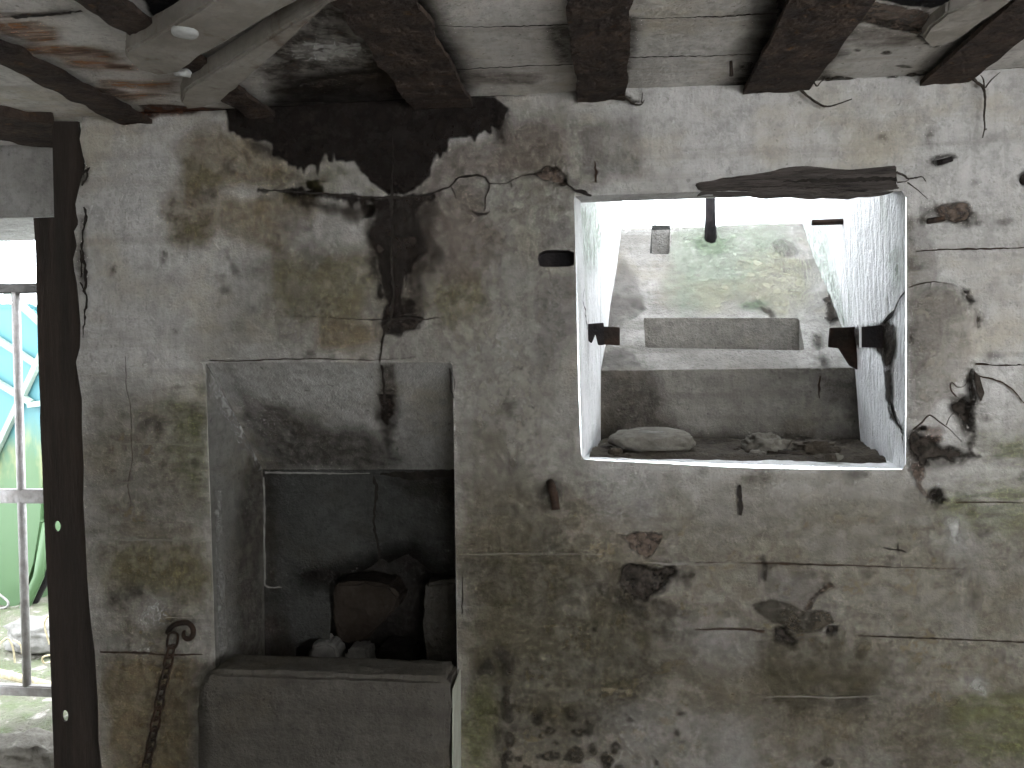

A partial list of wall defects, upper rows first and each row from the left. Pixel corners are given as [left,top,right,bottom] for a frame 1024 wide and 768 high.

crack [79,167,90,335]
crack [209,124,535,404]
crack [566,161,598,197]
leakage [168,96,1024,768]
spalling [854,318,984,498]
spalling [601,532,695,619]
peeling [753,583,879,706]